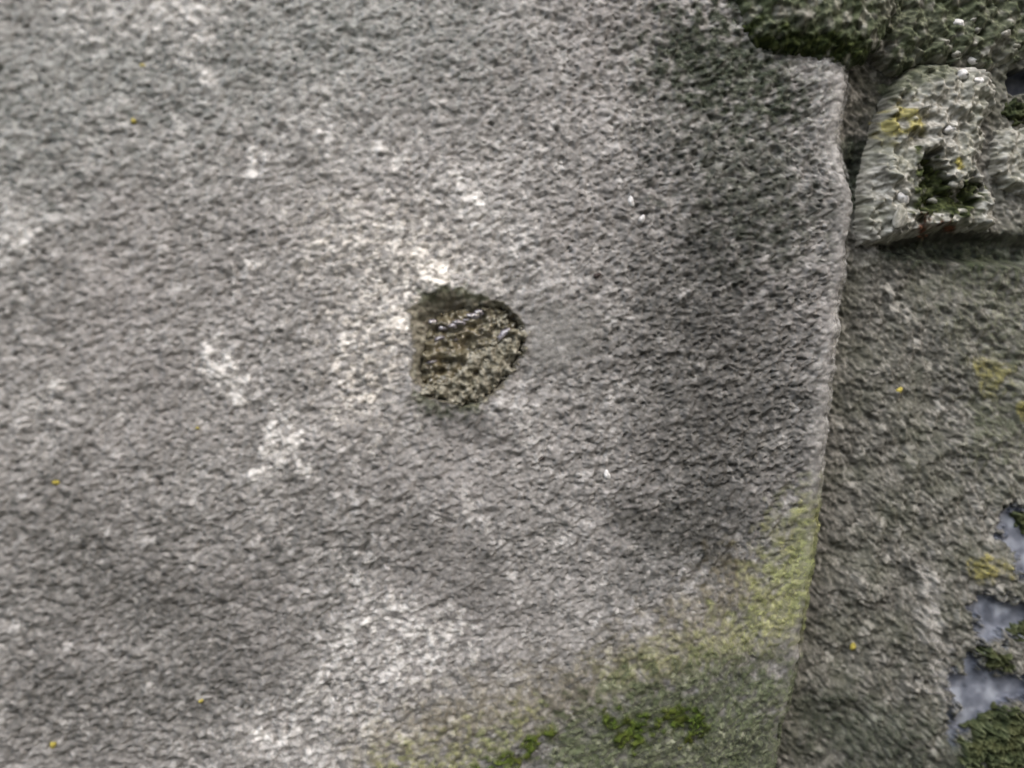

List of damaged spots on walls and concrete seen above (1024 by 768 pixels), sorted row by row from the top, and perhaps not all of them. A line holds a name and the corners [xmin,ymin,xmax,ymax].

damp [644,0,836,122]
efflorescence [295,617,376,705]
efflorescence [382,594,478,687]
damp [249,717,302,746]
damp [360,719,378,745]
damp [390,728,421,744]